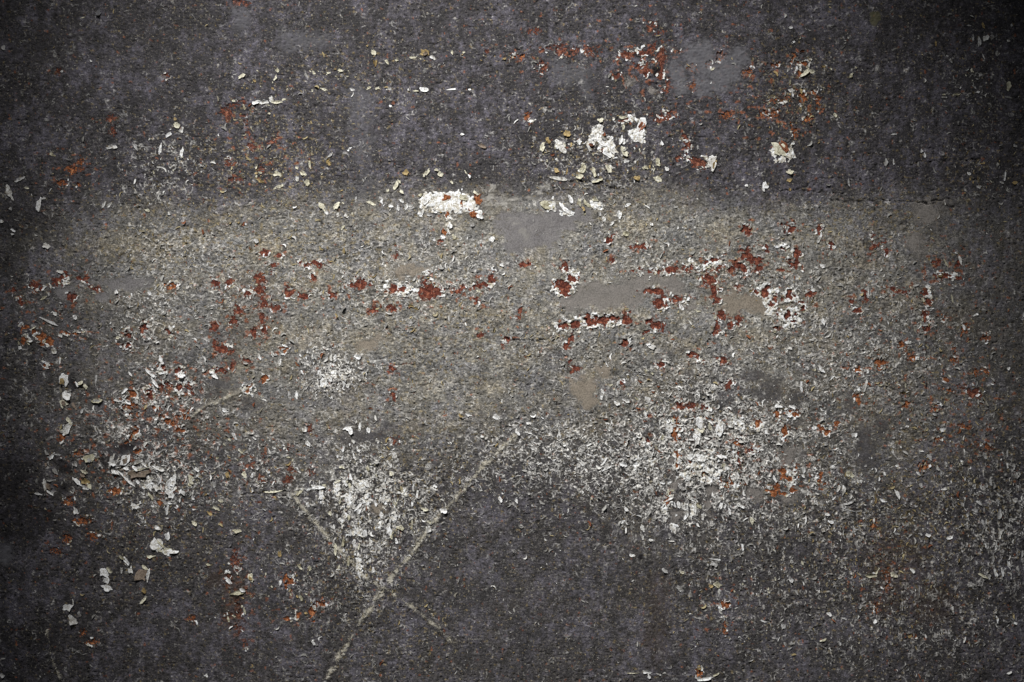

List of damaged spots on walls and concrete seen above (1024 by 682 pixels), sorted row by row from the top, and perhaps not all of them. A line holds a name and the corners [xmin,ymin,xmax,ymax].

corrosion [612,21,683,93]
corrosion [612,109,678,125]
corrosion [759,53,825,140]
peeling [523,78,695,283]
peeling [707,146,724,172]
corrosion [11,270,101,308]
corrosion [297,258,325,281]
corrosion [347,263,497,314]
corrosion [550,219,819,374]
corrosion [887,252,965,334]
corrosion [119,248,310,455]
peeling [62,594,95,625]